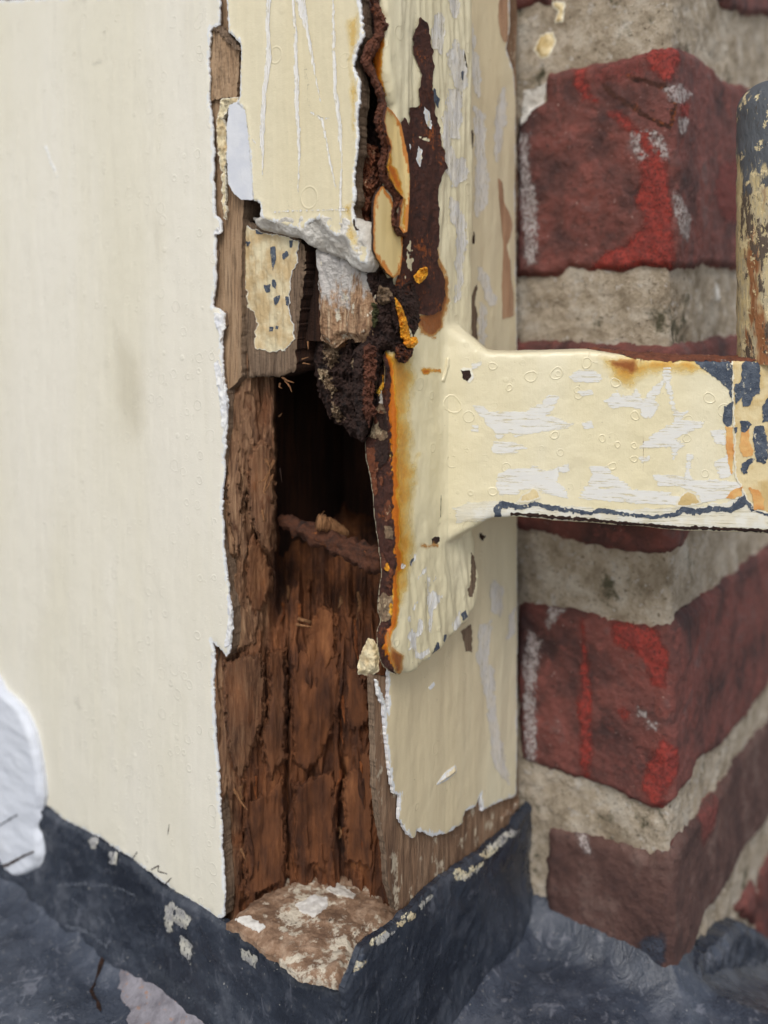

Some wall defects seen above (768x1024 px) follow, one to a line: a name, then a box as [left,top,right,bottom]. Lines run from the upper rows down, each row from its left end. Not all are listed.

peeling [210,25,254,235]
spalling [245,107,410,443]
peeling [214,312,226,342]
corrosion [351,0,449,674]
peeling [214,360,228,431]
peeling [460,367,474,383]
corrosion [575,347,756,383]
spalling [315,514,349,537]
peeling [493,495,768,519]
peeling [224,595,233,647]